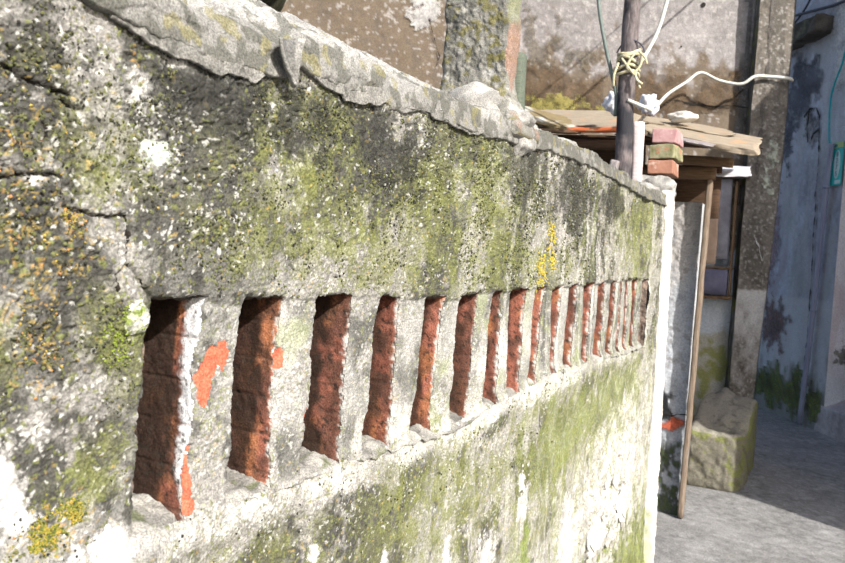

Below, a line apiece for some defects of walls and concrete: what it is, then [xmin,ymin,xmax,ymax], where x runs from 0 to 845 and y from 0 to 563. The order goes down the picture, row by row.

crack [0,44,72,109]
water stain [522,8,597,71]
water stain [783,50,823,175]
crack [0,120,147,294]